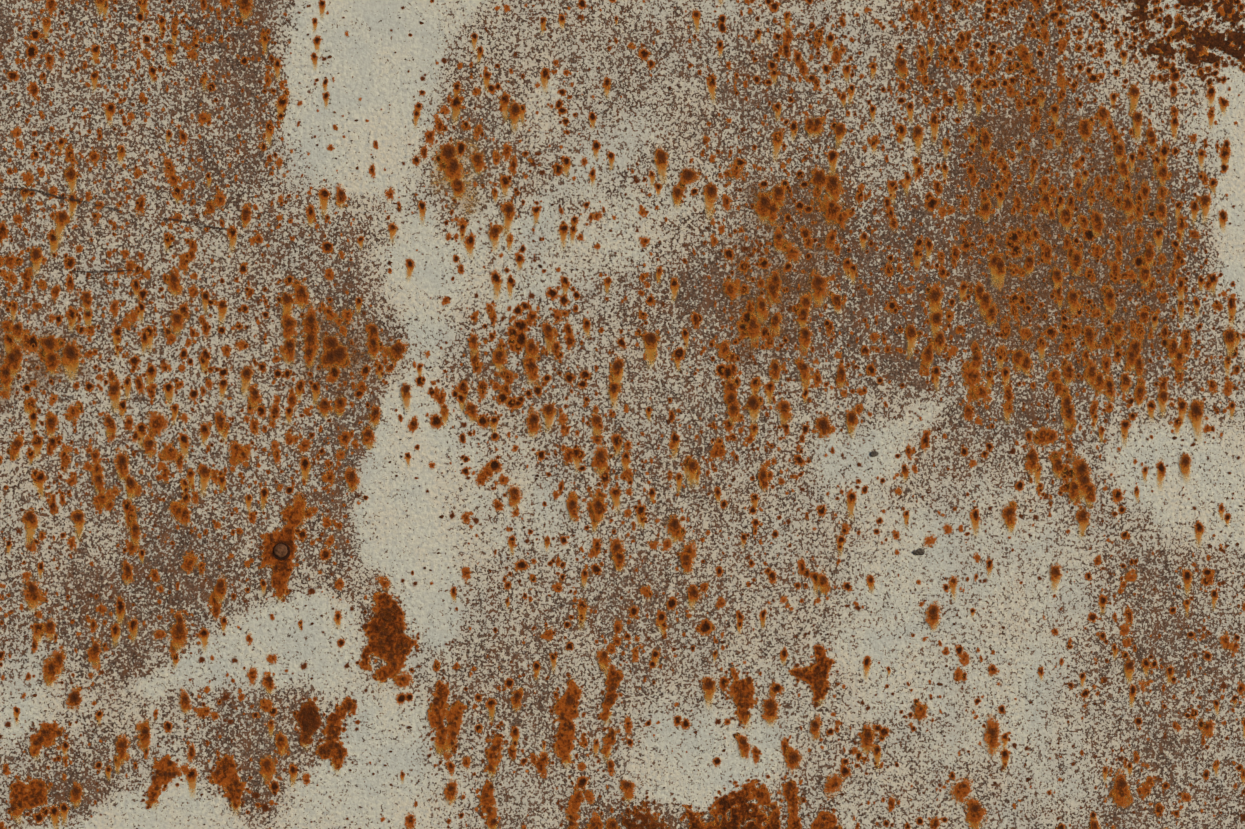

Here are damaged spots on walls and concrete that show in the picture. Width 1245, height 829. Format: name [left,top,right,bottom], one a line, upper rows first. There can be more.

rust [384,186,431,239]
rust [376,249,427,276]
rust [394,0,1245,667]
rust [1035,493,1245,760]
rust [896,599,1044,789]
rust [1049,729,1192,829]
rust [1203,760,1245,798]
rust [380,801,418,829]
rust [905,816,948,829]